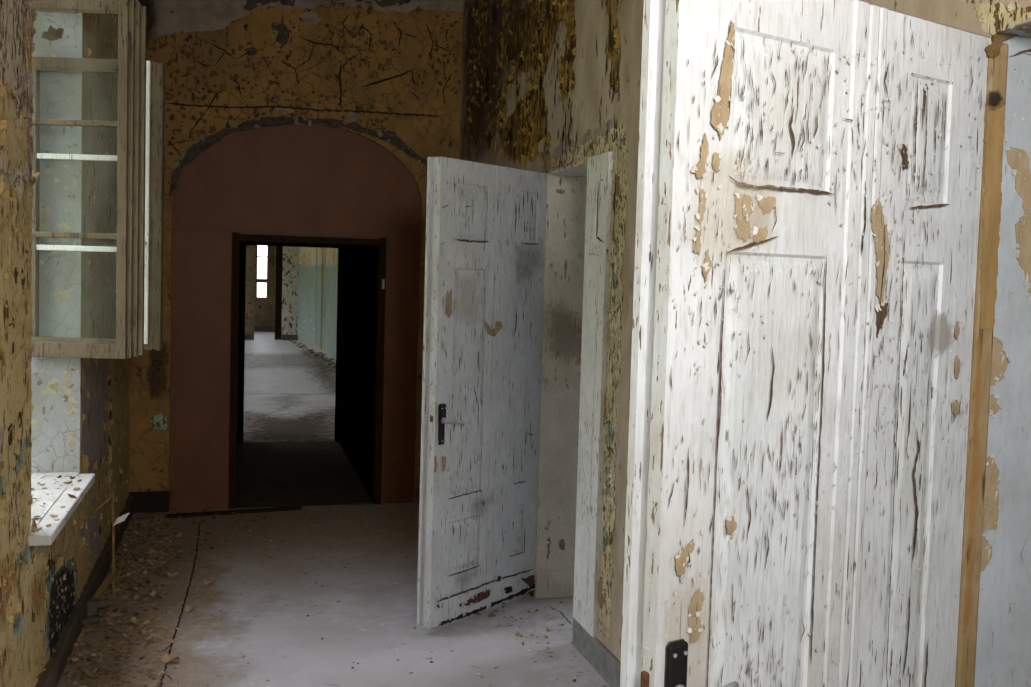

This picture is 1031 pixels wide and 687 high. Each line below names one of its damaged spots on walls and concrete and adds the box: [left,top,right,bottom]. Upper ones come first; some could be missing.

flaking render [146,0,627,196]
crack [166,0,622,267]
crack [440,175,542,311]
peeling [608,174,621,232]
peeling [691,19,777,352]
peeling [811,51,967,429]
peeling [1003,135,1031,301]
peeling [434,455,447,474]
crack [437,279,541,602]
crack [159,522,201,687]
peeling [435,572,535,626]
peeling [597,576,606,610]